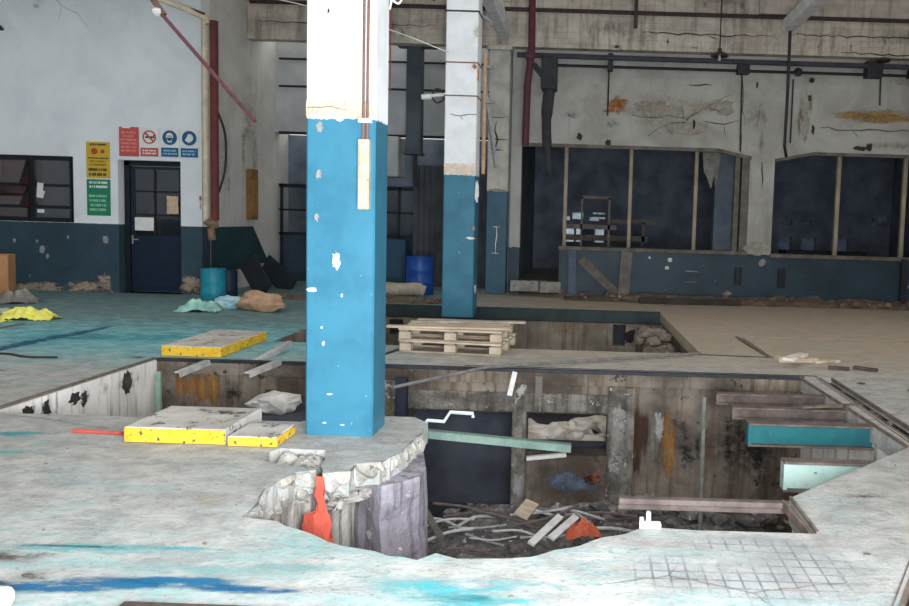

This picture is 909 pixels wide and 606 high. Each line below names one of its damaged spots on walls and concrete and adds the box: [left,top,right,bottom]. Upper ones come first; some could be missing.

flaking render [306,98,375,132]
crack [634,84,746,148]
peeling [332,252,340,270]
peeling [16,274,111,291]
rust [661,416,675,475]